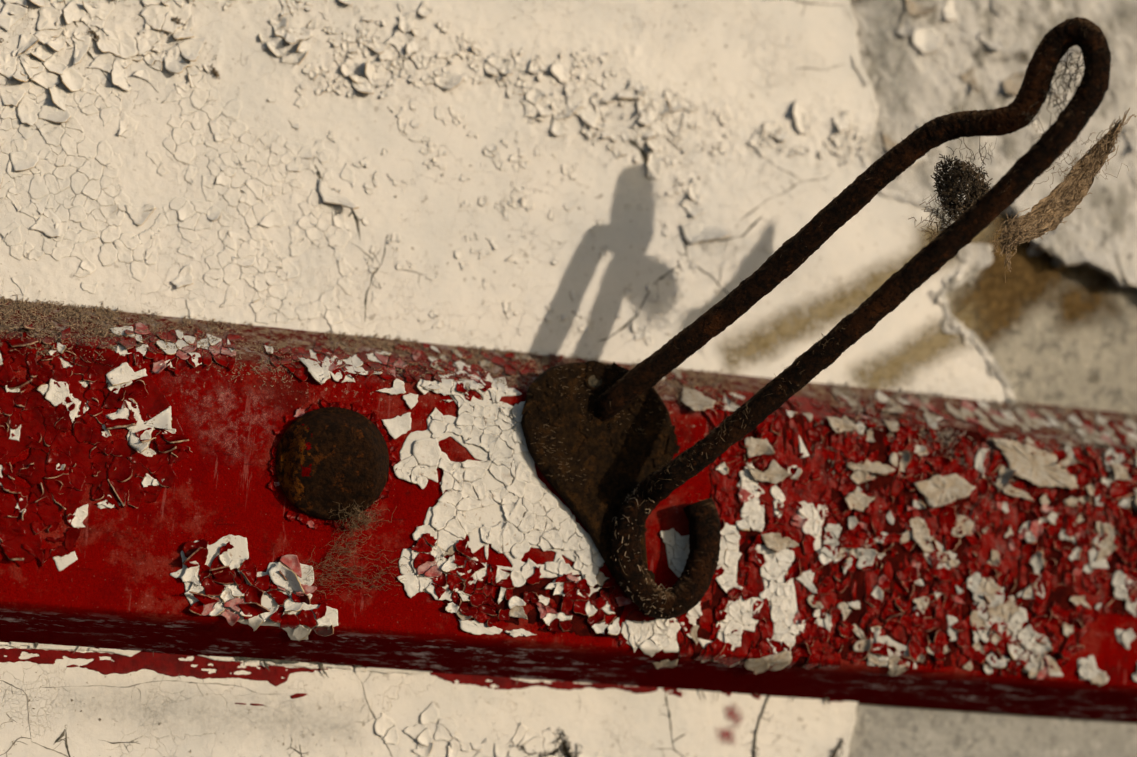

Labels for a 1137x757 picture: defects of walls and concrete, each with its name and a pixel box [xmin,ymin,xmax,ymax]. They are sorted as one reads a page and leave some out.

peeling [0,0,414,335]
peeling [259,0,743,316]
peeling [748,100,897,166]
peeling [895,0,957,54]
peeling [1002,72,1025,96]
peeling [1059,46,1081,65]
corrosion [724,223,942,369]
corrosion [852,214,1116,390]
peeling [0,298,245,571]
peeling [170,225,1137,686]
crack [0,651,378,757]
crack [650,686,685,757]